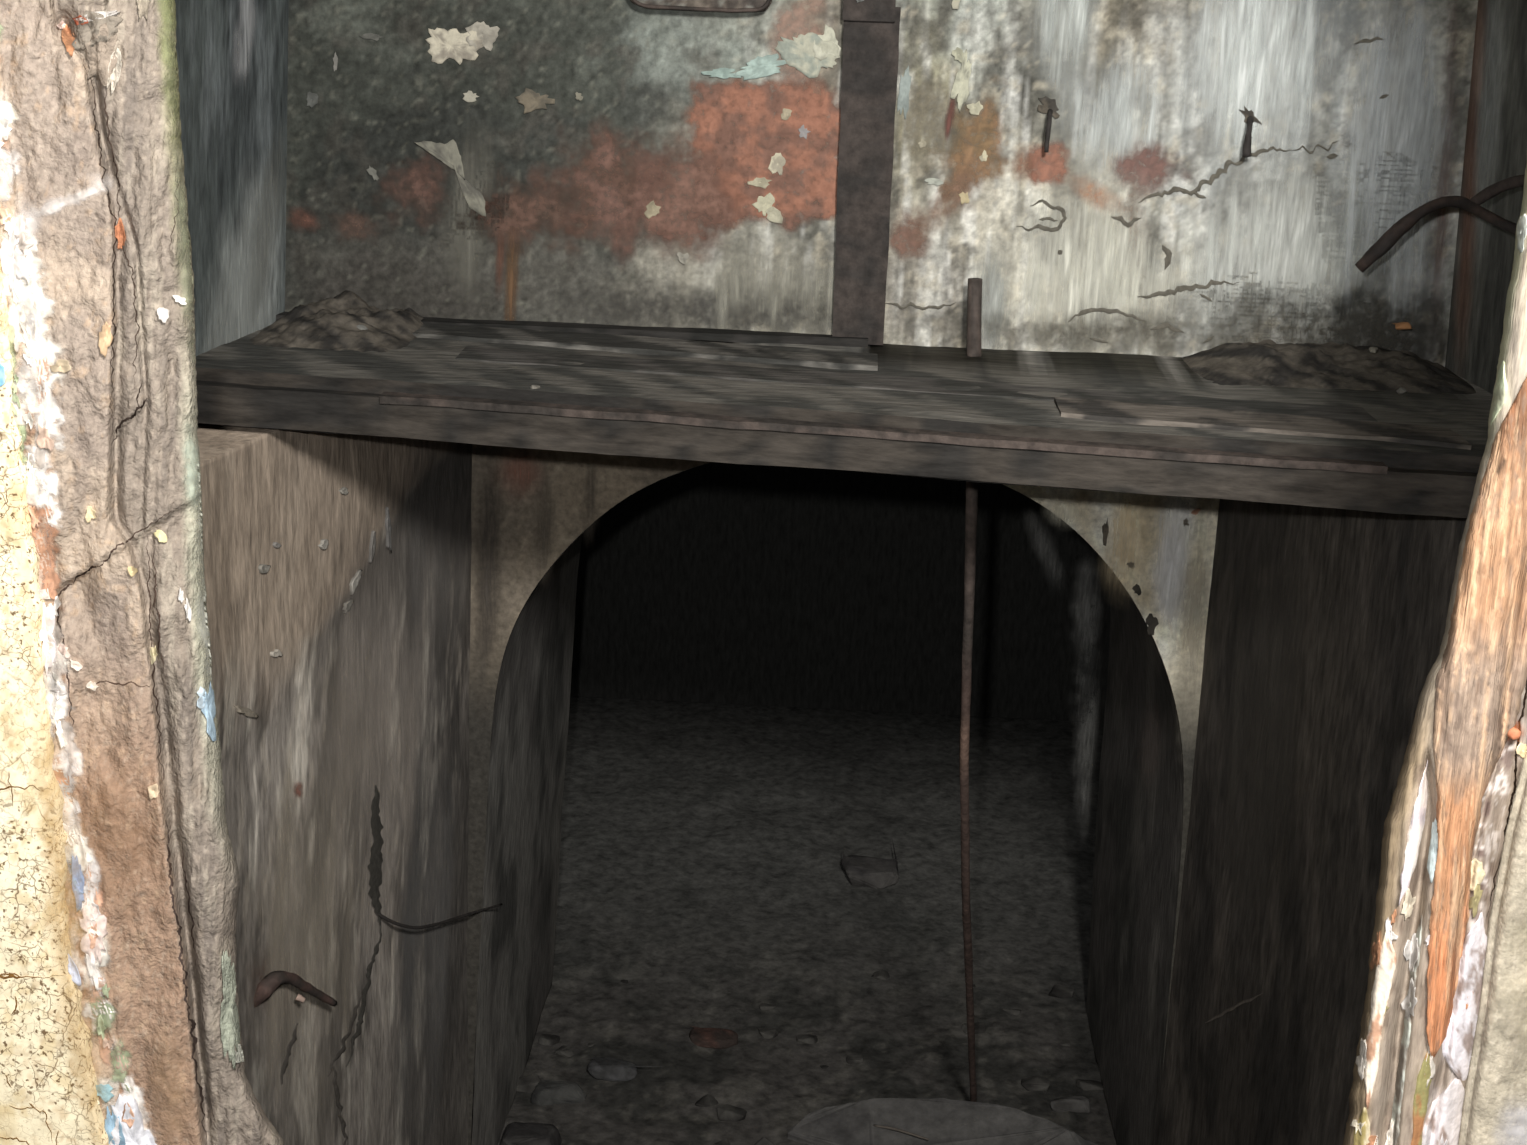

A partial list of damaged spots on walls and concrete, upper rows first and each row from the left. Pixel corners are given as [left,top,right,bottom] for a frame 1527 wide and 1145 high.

spalling [57,0,150,94]
crack [83,59,147,445]
peeling [366,0,841,265]
corrosion [1016,144,1067,183]
crack [1018,199,1067,255]
water stain [1045,0,1087,82]
water stain [981,202,1180,349]
water stain [1076,69,1155,157]
crack [1068,140,1339,343]
crack [1354,36,1384,44]
peeling [0,101,157,1145]
peeling [1369,888,1430,1020]